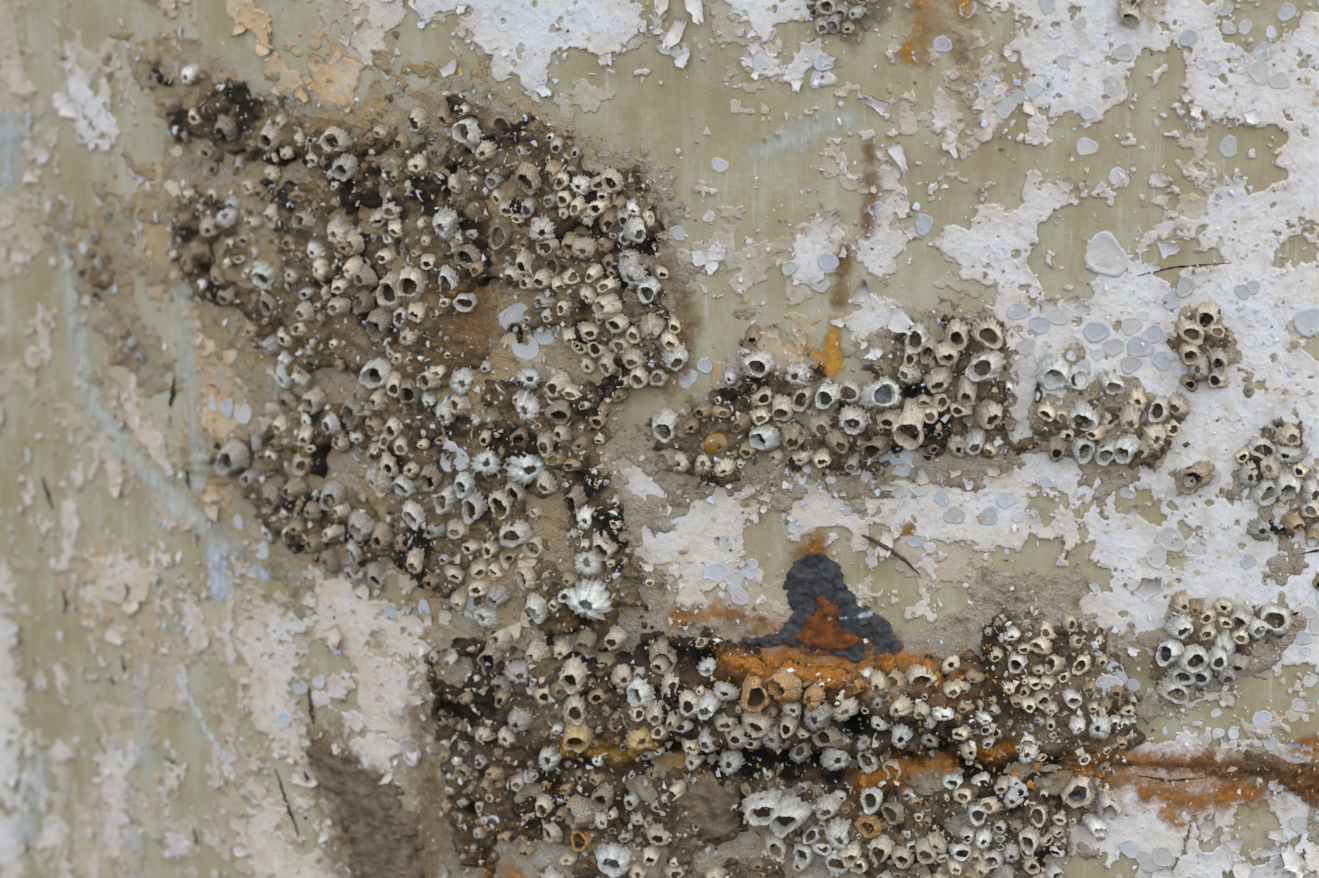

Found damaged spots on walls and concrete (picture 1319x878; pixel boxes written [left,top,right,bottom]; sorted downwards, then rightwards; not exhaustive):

rust [900,0,937,65]
rust [955,0,972,29]
peeling [0,0,152,281]
peeling [169,144,183,156]
peeling [141,221,179,311]
peeling [225,0,1319,687]
rust [901,523,914,535]
peeling [0,298,464,878]
rust [668,530,940,686]
rust [856,753,958,791]
rust [1065,738,1319,827]
peeling [1067,682,1319,878]